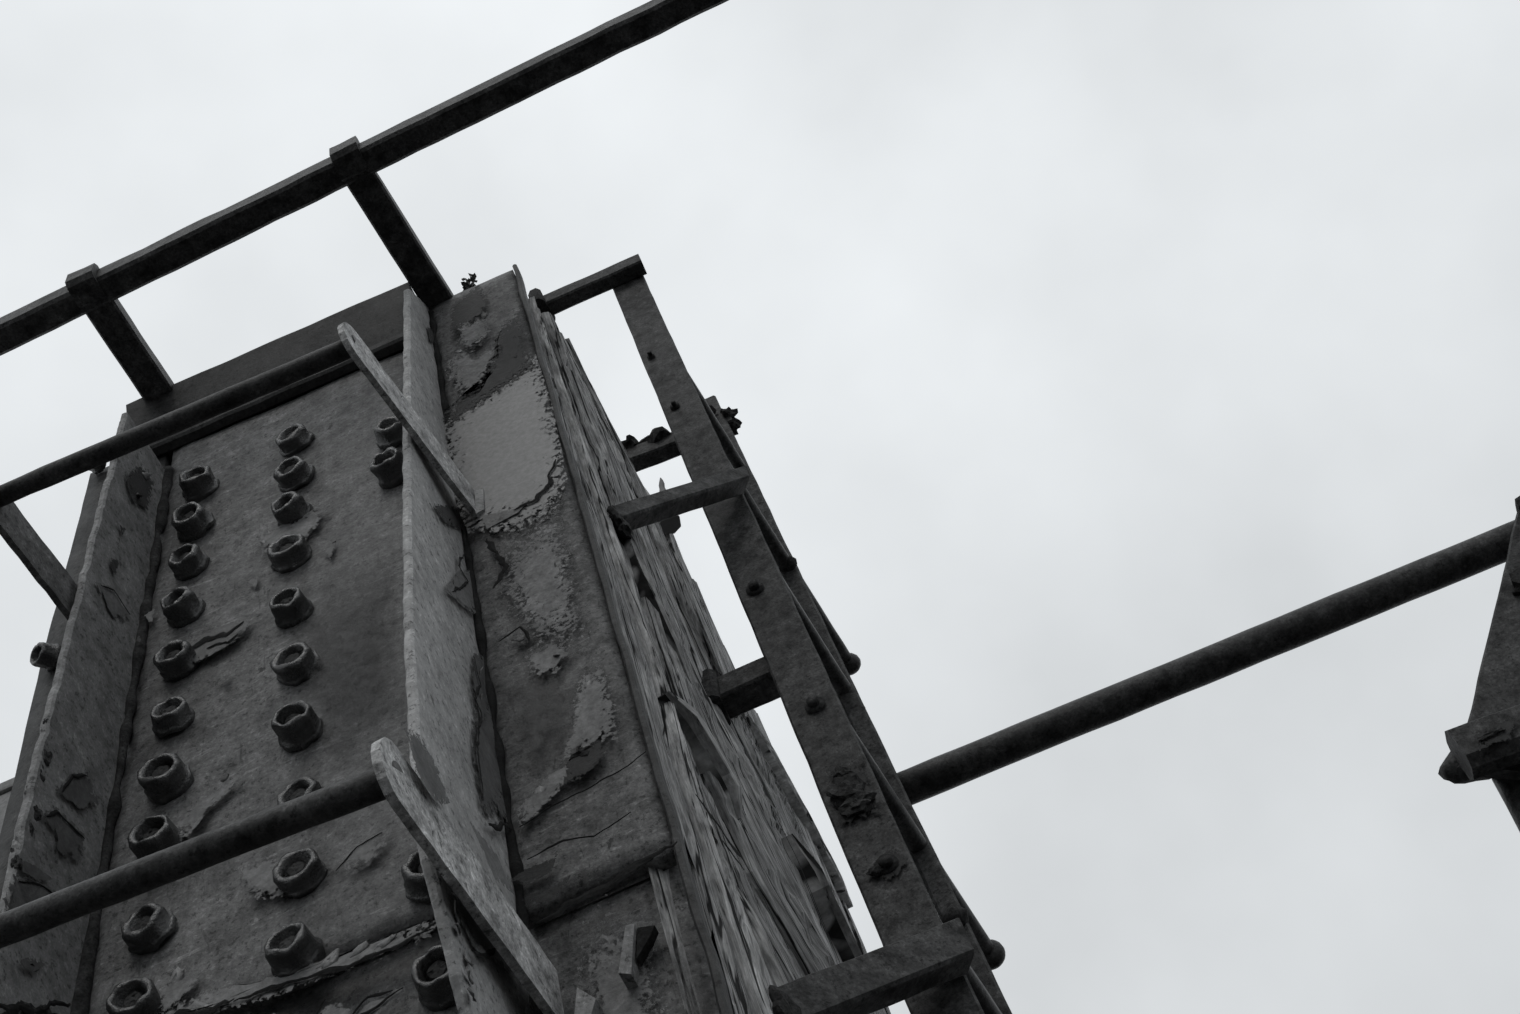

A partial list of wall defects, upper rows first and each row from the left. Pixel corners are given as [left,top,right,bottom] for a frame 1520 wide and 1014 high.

peeling [429,286,620,907]
spalling [404,728,451,806]
peeling [3,749,99,911]
peeling [158,960,206,1011]
peeling [319,1002,350,1014]